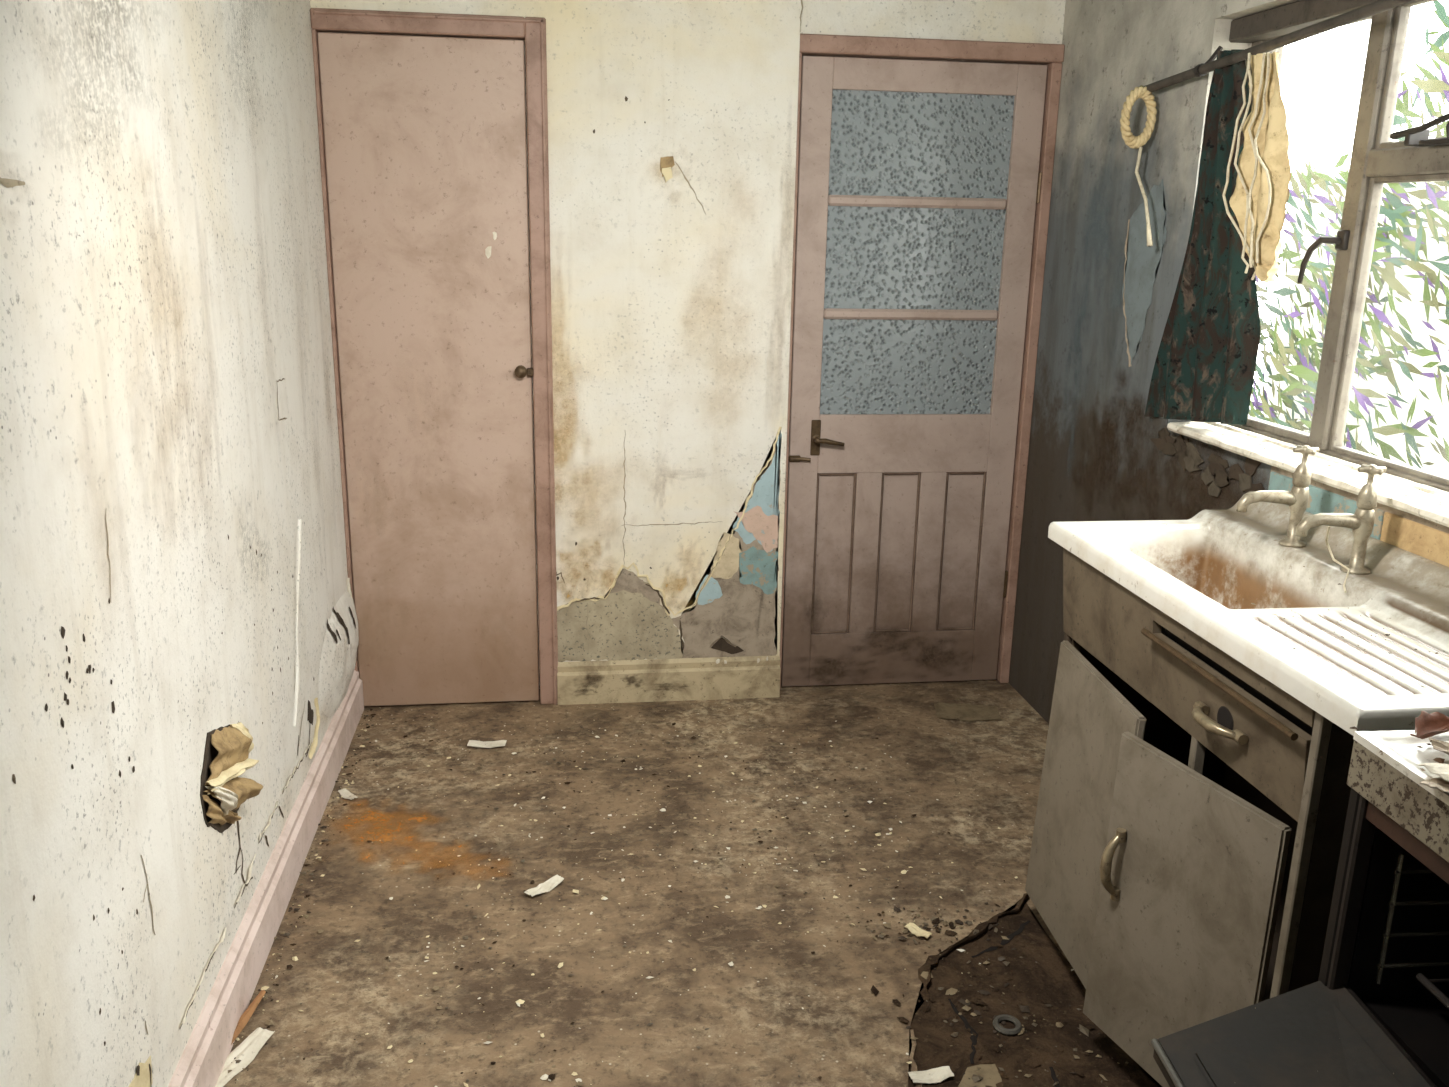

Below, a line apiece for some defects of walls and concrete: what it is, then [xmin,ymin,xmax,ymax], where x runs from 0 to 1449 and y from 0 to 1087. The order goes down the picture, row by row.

leakage [1078,378,1236,520]
flaking render [557,438,781,664]
hole [200,724,240,833]
crack [234,806,284,886]
flaking render [128,1056,153,1087]